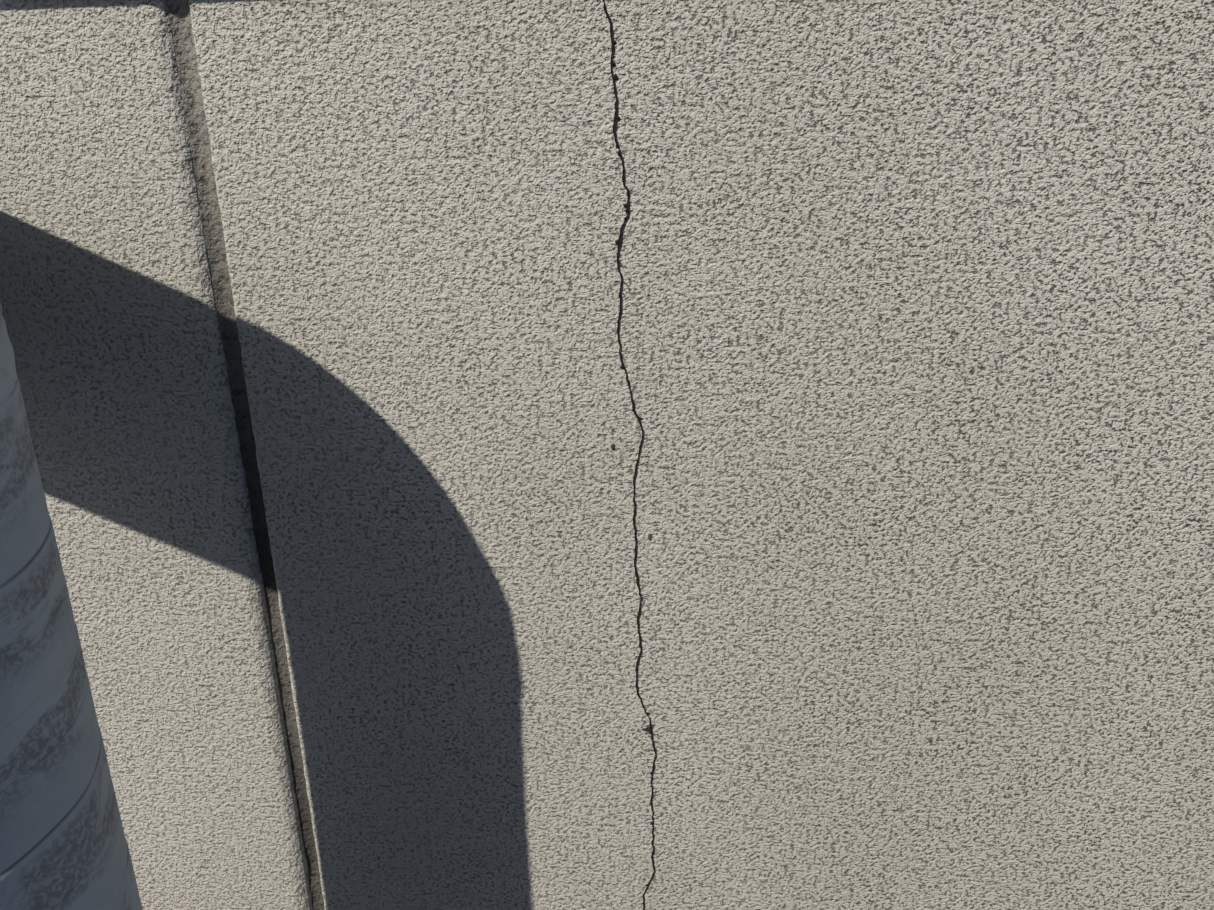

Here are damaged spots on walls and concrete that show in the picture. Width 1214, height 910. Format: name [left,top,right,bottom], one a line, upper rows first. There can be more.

crack [603,0,656,910]